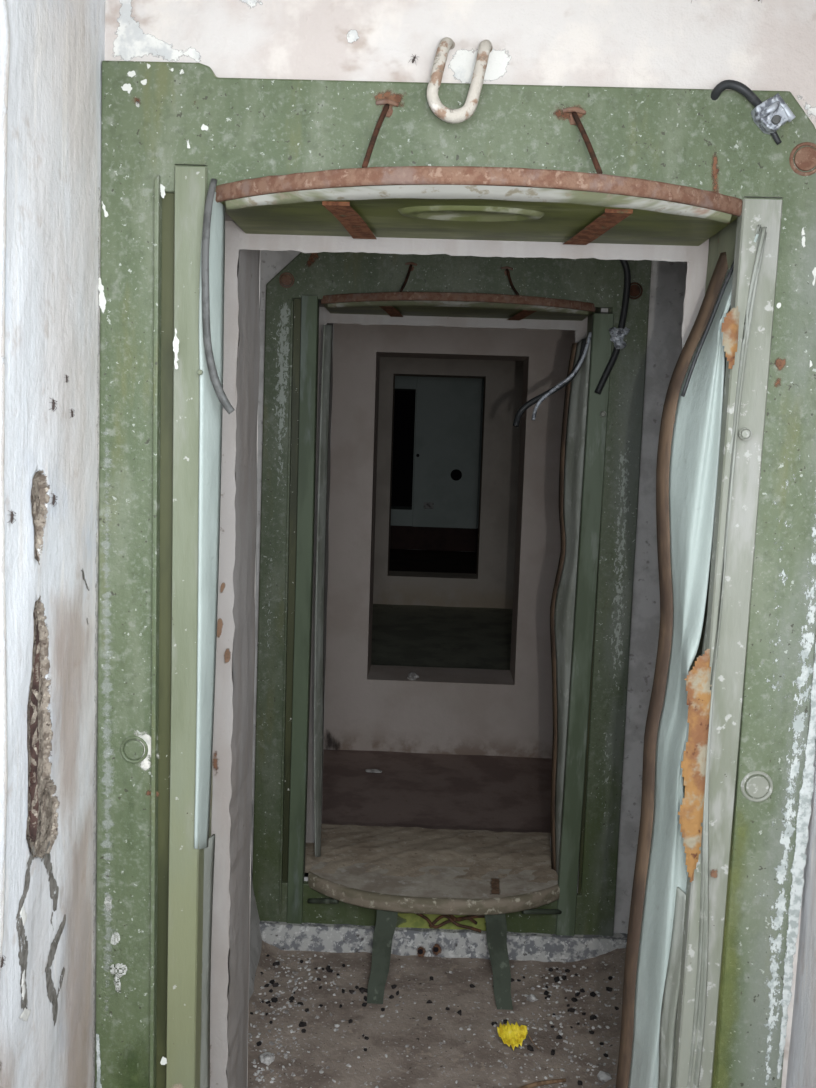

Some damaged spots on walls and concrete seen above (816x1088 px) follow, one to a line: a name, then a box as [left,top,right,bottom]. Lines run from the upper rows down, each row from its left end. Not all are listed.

flaking render [112,0,201,107]
rust [375,90,403,108]
rust [553,106,583,120]
crack [16,596,60,1022]